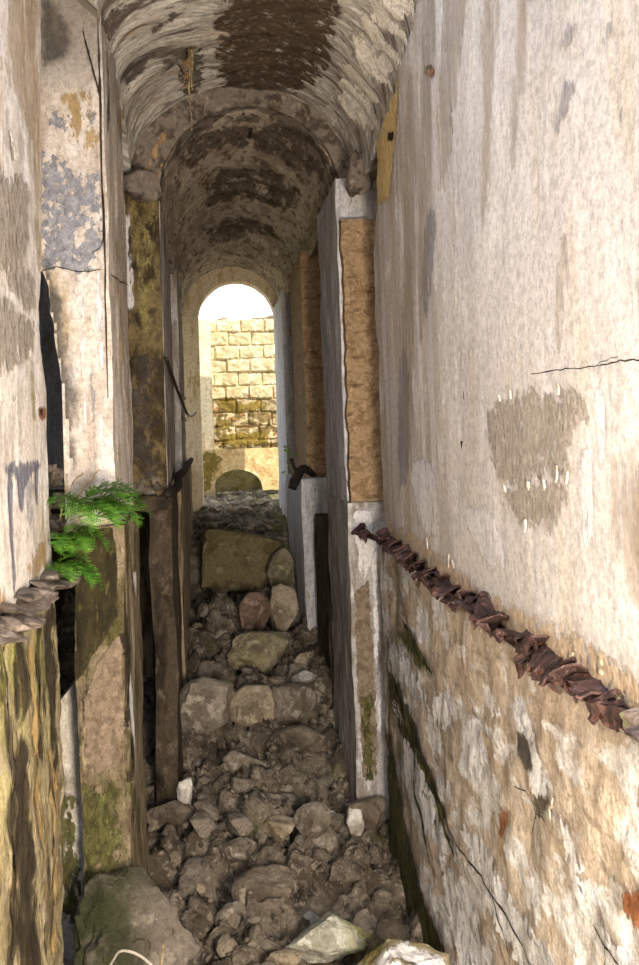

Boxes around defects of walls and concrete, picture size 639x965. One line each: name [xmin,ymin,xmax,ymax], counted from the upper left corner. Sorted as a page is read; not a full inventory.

flaking render [0,128,36,377]
water stain [132,353,160,488]
flaking render [486,381,589,536]
crack [531,356,639,374]
water stain [3,603,58,965]